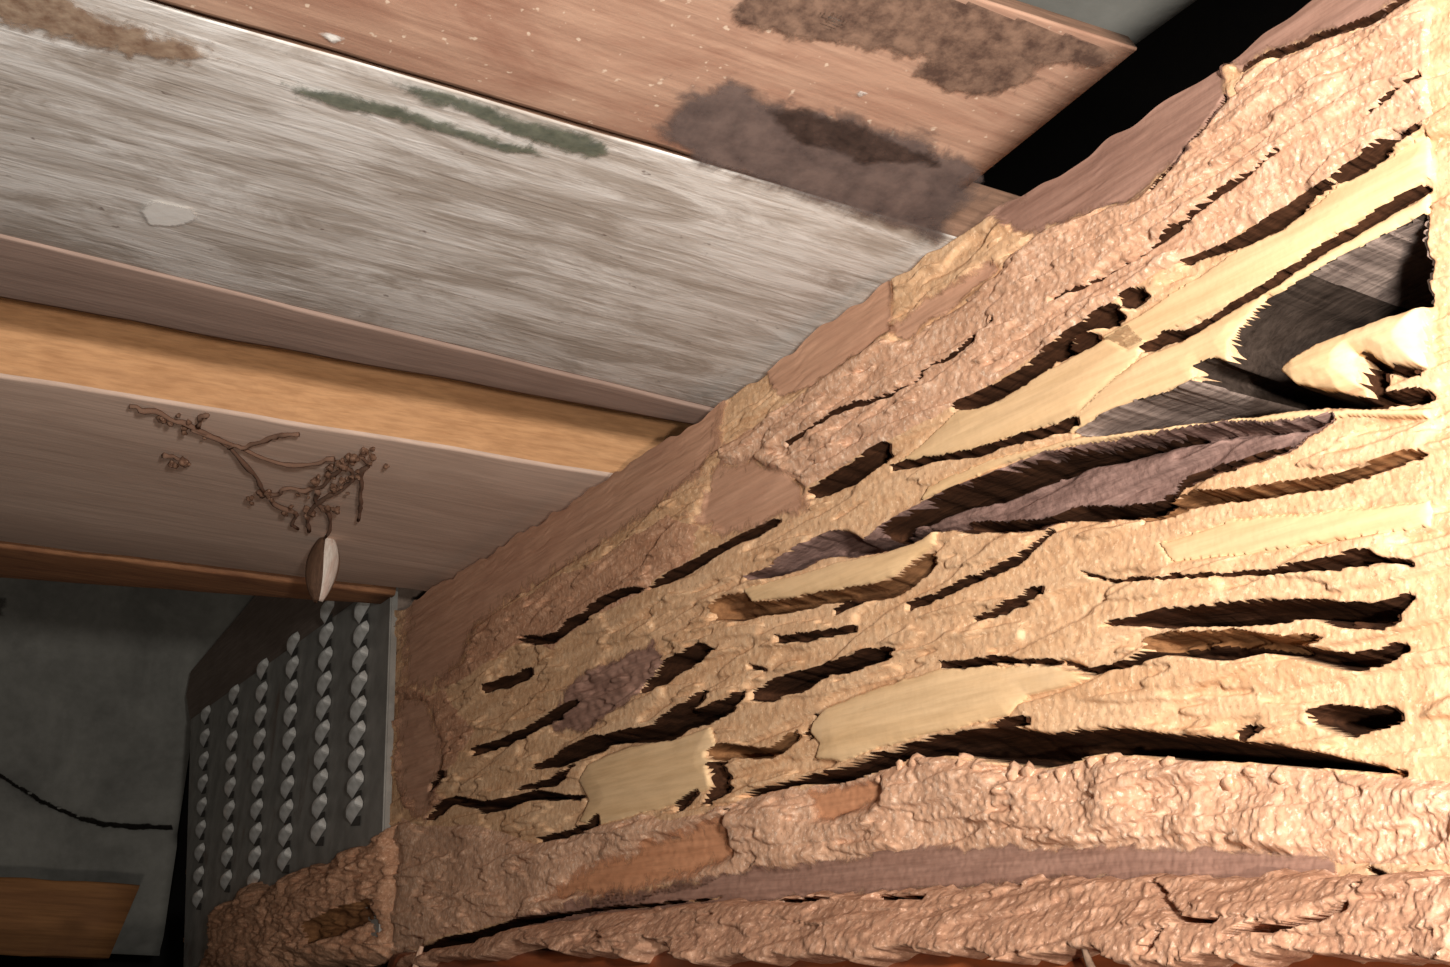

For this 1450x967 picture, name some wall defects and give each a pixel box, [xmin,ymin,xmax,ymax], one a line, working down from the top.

leakage [297,85,607,157]
leakage [664,81,982,244]
crack [1149,0,1409,190]
crack [951,75,1433,410]
crack [785,317,993,446]
crack [808,416,1080,498]
crack [482,518,782,693]
crack [774,600,866,643]
crack [906,528,1056,622]
crack [1081,548,1415,584]
crack [425,699,600,844]
crack [674,713,819,812]